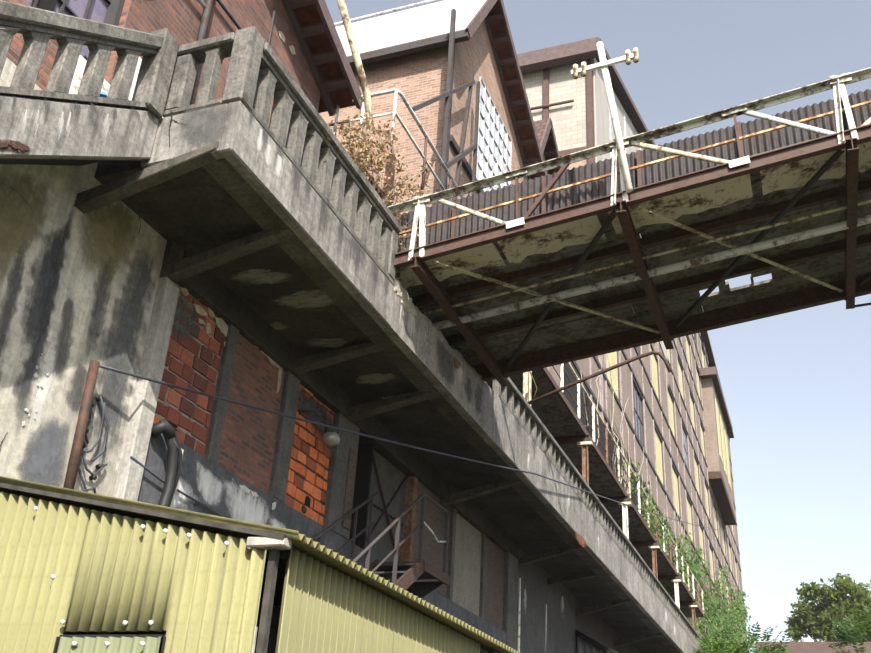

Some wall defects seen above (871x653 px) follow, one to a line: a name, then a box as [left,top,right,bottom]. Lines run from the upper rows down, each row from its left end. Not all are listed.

damp [0,215,73,416]
damp [68,250,154,456]